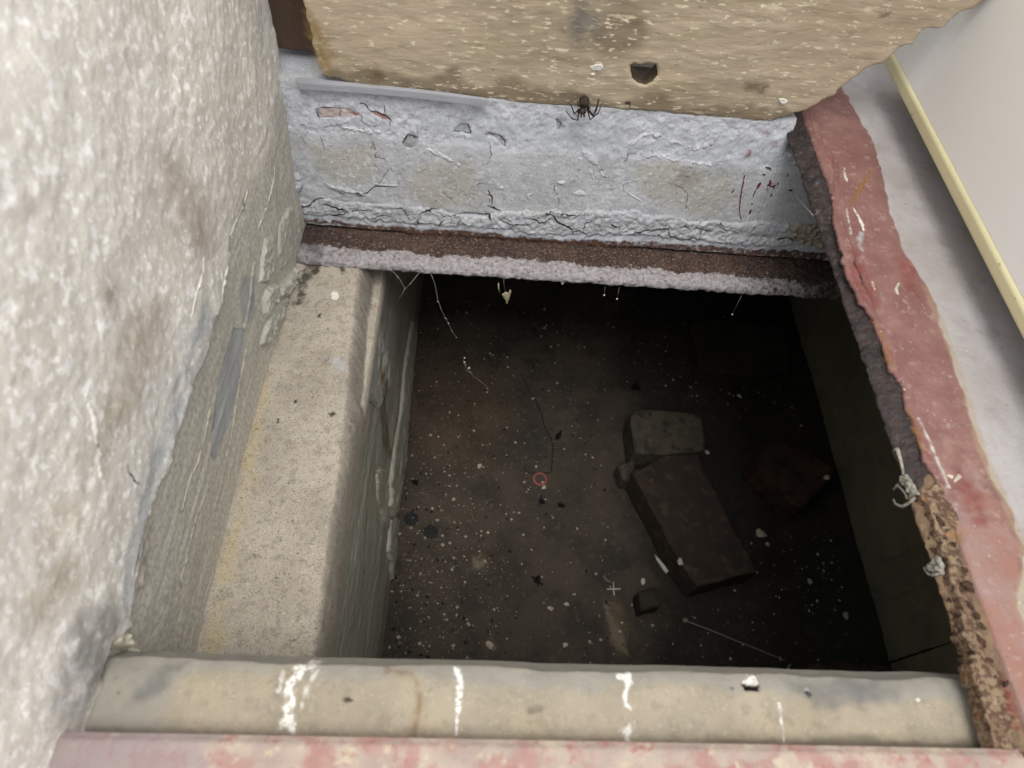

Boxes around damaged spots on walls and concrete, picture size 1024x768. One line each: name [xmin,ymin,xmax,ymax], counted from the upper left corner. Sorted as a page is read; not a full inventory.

peeling [316,107,362,118]
crack [302,103,396,196]
crack [435,143,501,211]
flaking render [259,205,301,348]